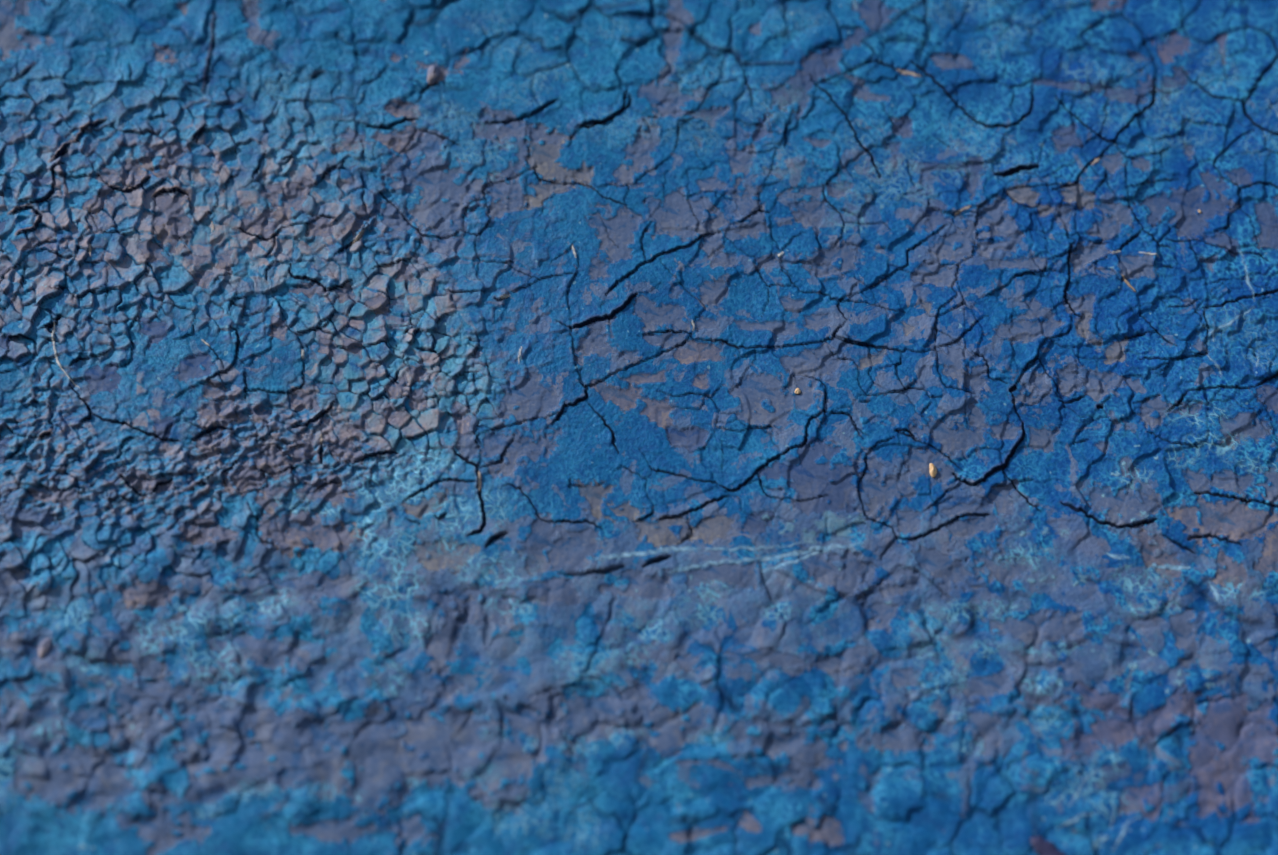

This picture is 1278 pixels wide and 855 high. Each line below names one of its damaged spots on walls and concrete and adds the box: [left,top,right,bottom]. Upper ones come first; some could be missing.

peeling [910,156,1278,287]
crack [0,30,1278,694]
peeling [996,294,1202,453]
peeling [174,352,428,559]
peeling [758,339,1060,633]
peeling [1081,457,1278,593]
crack [0,721,61,800]
peeling [0,479,774,855]
crack [905,601,1014,754]
crack [1023,644,1072,729]
crack [1050,754,1129,816]
peeling [947,666,1278,823]